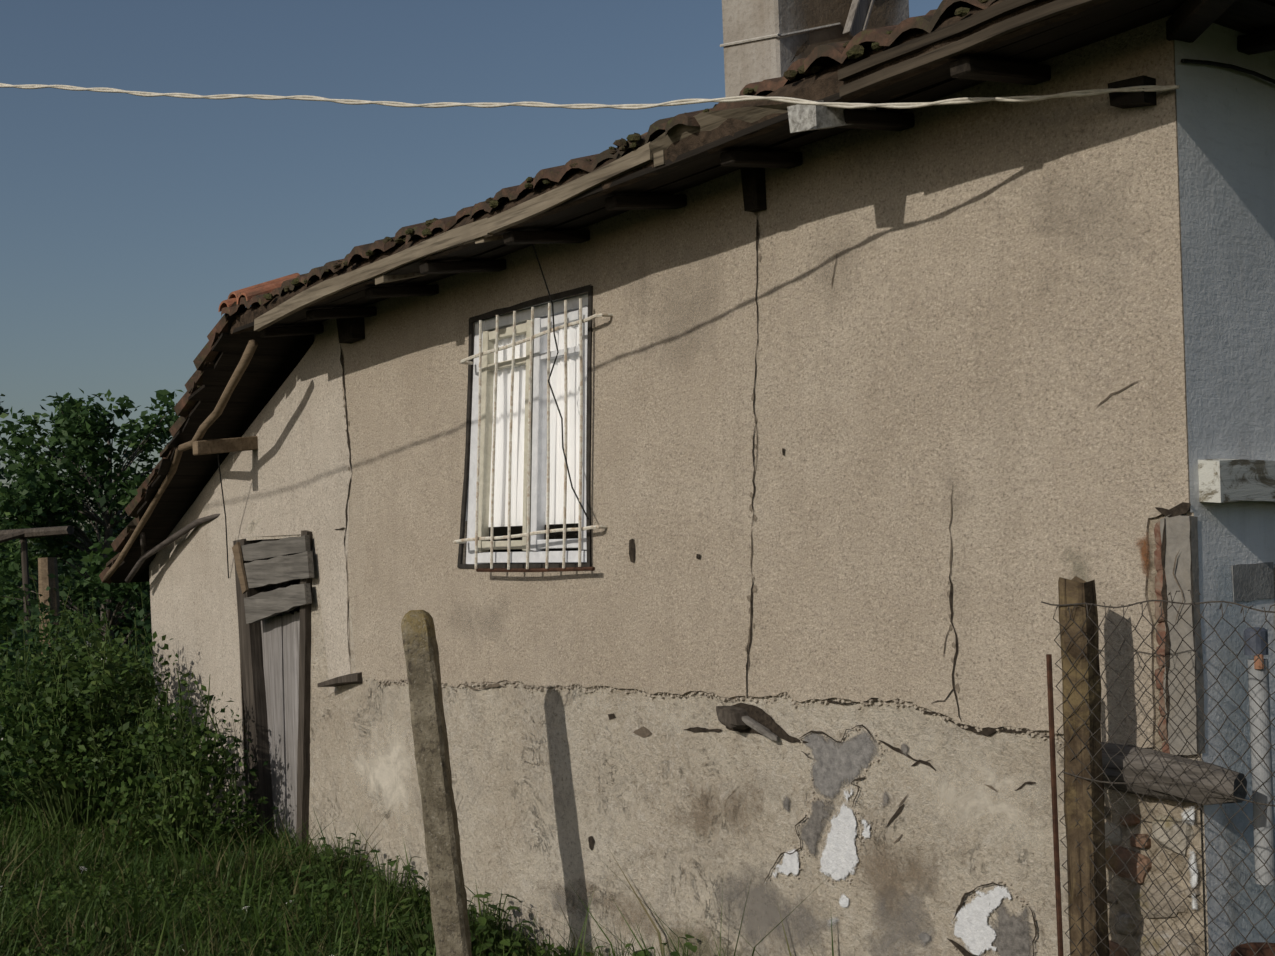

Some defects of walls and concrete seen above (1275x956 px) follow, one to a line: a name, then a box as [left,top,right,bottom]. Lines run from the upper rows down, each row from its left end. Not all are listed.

crack [335,345,352,652]
crack [745,211,761,697]
crack [465,682,505,690]
crack [683,725,722,733]
crack [773,731,808,743]
spalling [764,724,926,923]
crack [821,484,1049,737]
spalling [947,880,1039,956]
flaking render [1148,517,1179,756]